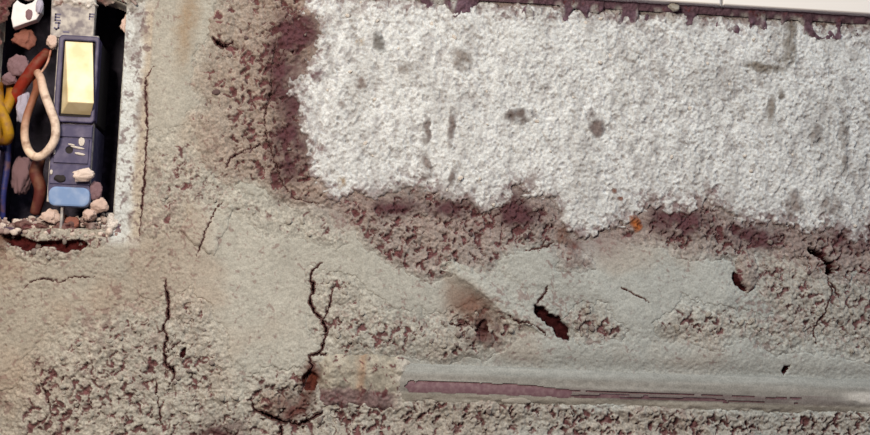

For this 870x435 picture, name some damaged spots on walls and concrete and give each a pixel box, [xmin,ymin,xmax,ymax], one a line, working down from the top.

crack [139,66,155,236]
flaking render [135,0,870,365]
spalling [0,228,114,267]
crack [24,275,95,289]
crack [154,280,181,423]
crack [301,262,334,393]
crack [812,277,839,344]
crack [40,380,52,412]
crack [250,399,323,435]